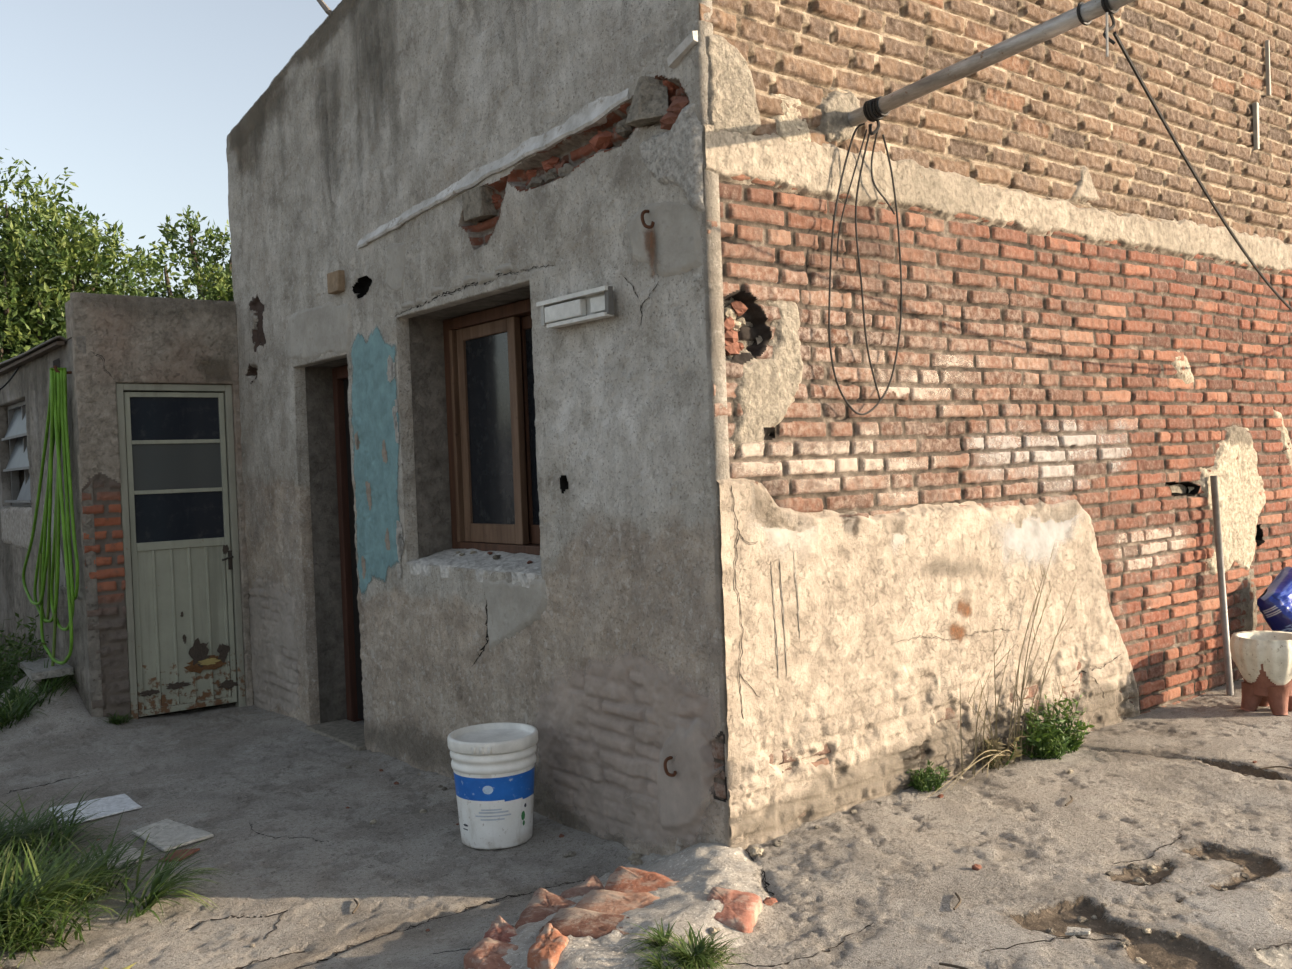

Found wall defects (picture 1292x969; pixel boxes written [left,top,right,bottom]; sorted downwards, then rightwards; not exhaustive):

leakage [230,0,356,169]
spalling [458,75,689,250]
rust [644,230,655,276]
spalling [246,296,266,384]
spalling [723,289,772,364]
crack [731,486,759,717]
spalling [699,731,728,802]